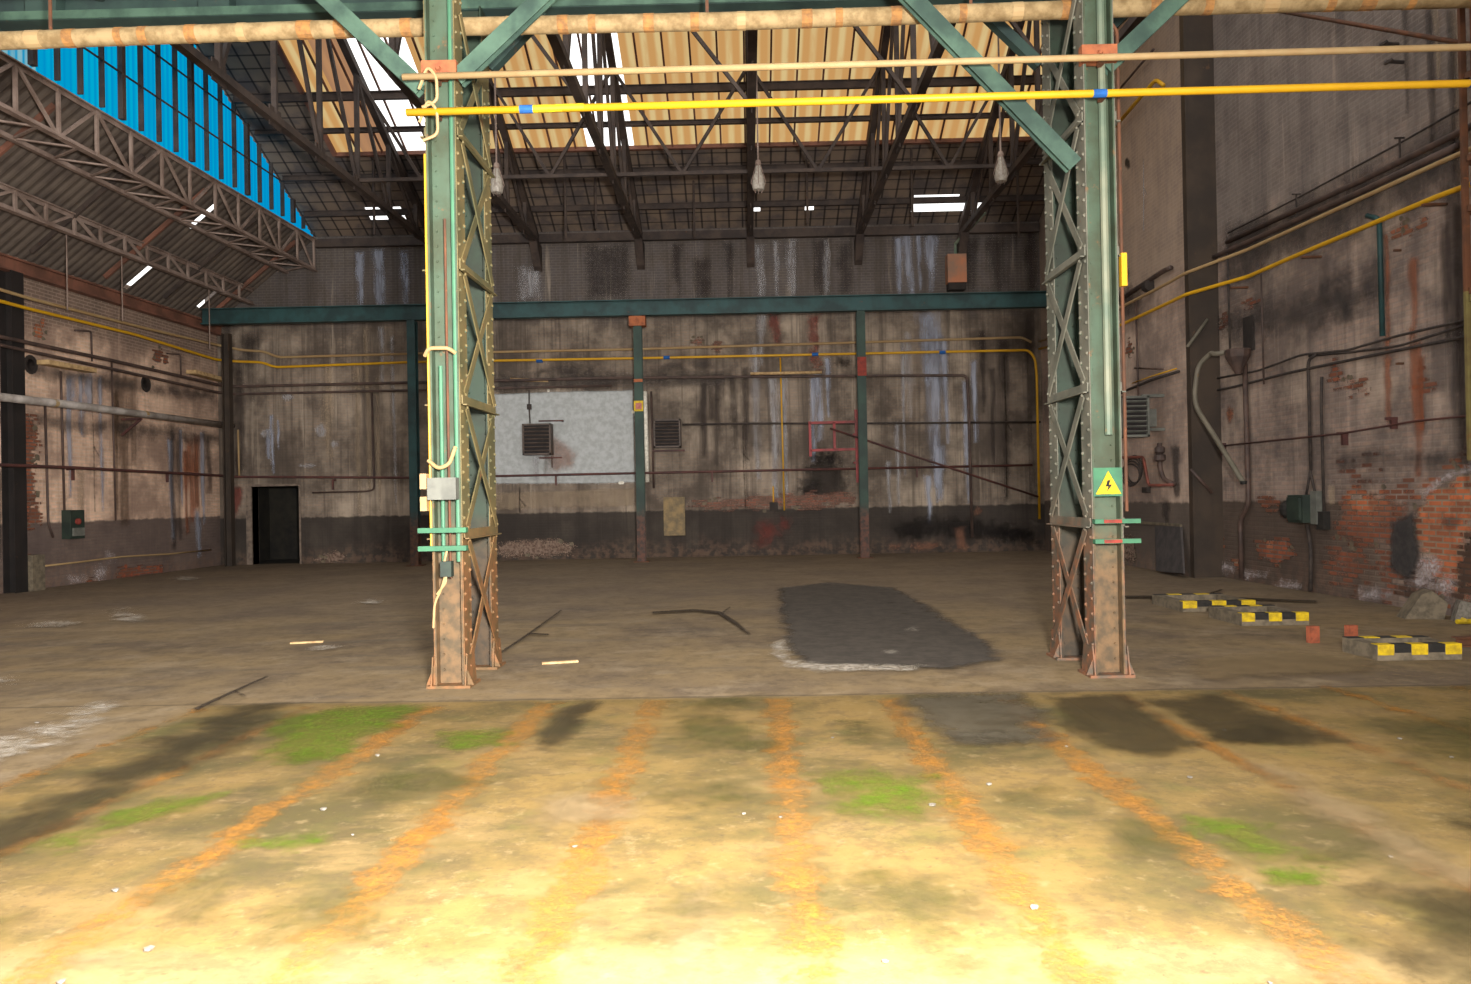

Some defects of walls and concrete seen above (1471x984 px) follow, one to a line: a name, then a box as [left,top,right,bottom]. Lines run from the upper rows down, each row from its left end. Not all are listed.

damp [895,235,936,289]
spalling [1391,216,1428,239]
damp [811,359,829,461]
damp [926,318,976,520]
spalling [1327,357,1369,399]
corrosion [184,437,198,530]
peeling [1323,449,1471,609]